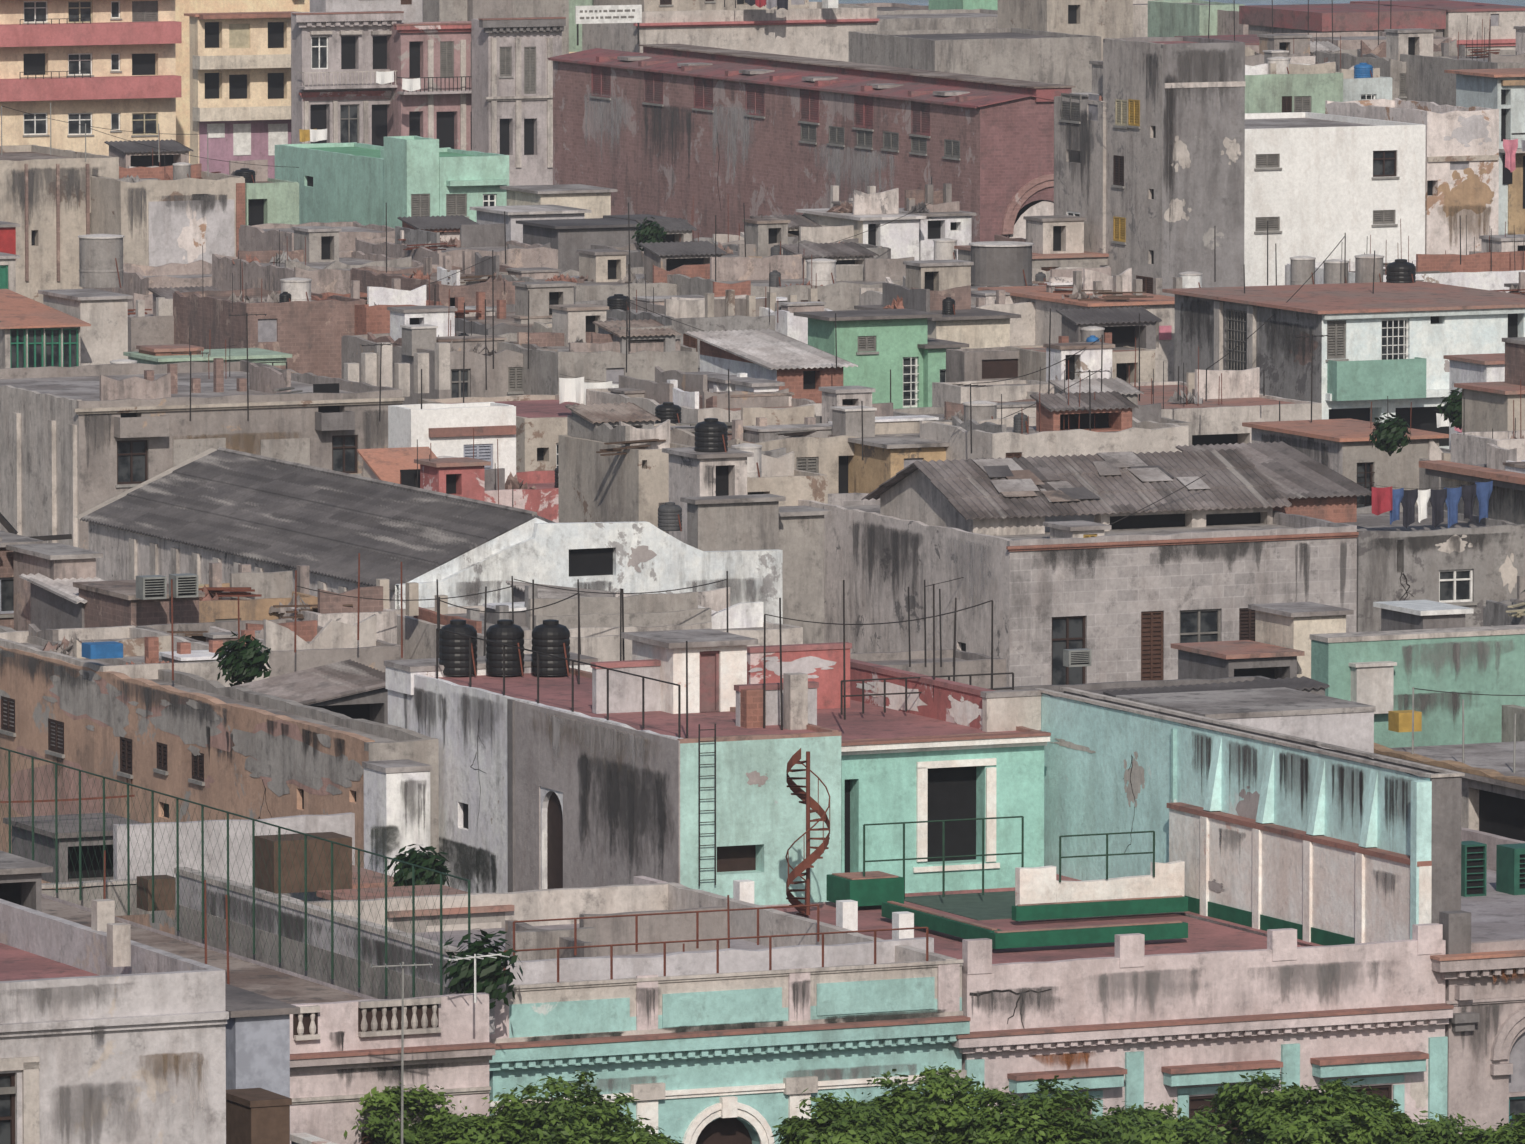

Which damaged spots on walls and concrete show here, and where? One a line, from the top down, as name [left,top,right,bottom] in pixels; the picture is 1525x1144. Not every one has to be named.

flaking render [43,666,364,797]
peeling [856,682,927,711]
peeling [948,695,982,726]
leakage [579,755,666,867]
peeling [1124,752,1145,808]
leakage [1197,736,1211,770]
leakage [1229,746,1251,779]
leakage [1279,753,1308,808]
leakage [1332,765,1363,814]
leakage [1385,777,1407,819]
crack [970,989,1052,1029]